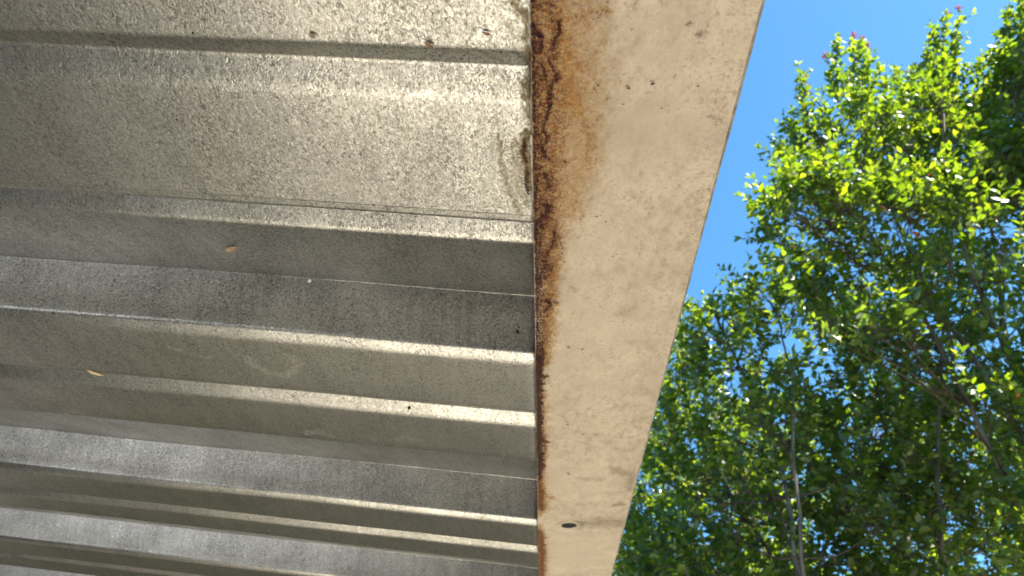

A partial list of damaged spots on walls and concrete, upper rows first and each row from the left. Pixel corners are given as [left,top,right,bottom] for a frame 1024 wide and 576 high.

rust [531,0,610,576]